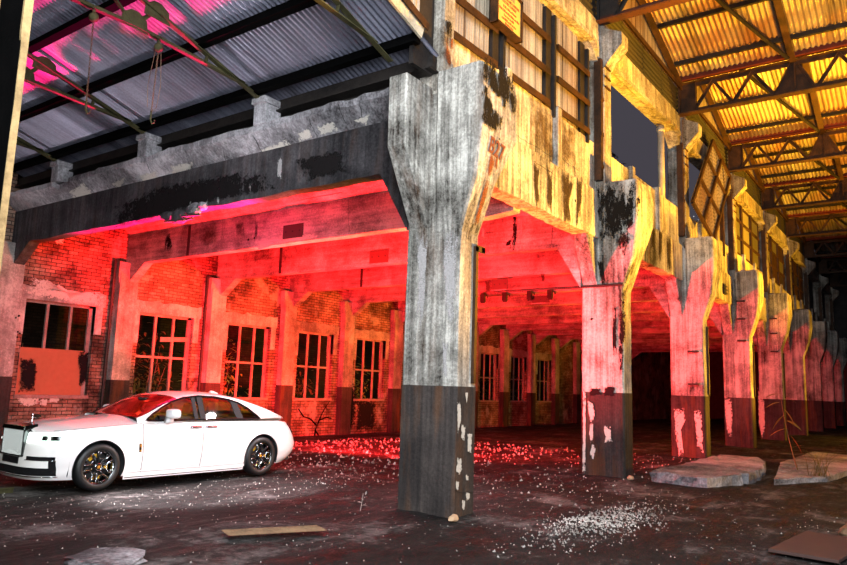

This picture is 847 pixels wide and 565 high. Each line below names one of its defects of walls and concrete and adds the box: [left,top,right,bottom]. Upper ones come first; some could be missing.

water stain [480,56,518,131]
water stain [532,96,552,154]
water stain [562,127,573,161]
water stain [534,163,553,214]
water stain [563,173,583,226]
water stain [505,216,523,250]
peeling [24,279,105,306]
peeling [457,393,472,453]
peeling [582,386,615,472]
peeling [674,409,704,456]
peeling [456,457,470,510]